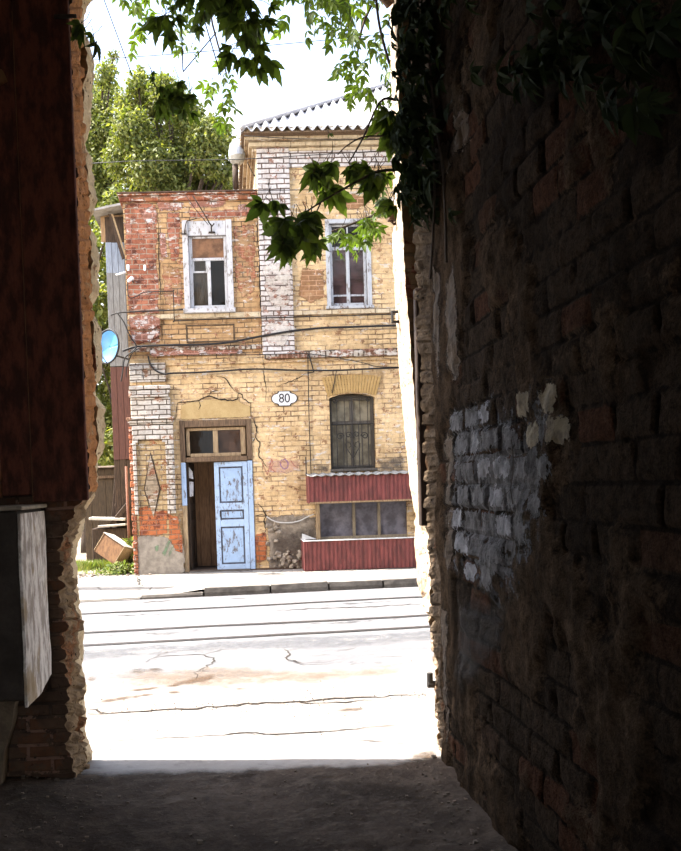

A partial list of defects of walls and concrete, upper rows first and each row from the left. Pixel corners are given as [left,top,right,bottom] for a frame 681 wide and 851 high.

peeling [346,194,366,209]
peeling [123,200,325,357]
crack [175,218,304,469]
peeling [448,378,572,610]
flaking render [138,506,185,575]
crack [146,654,216,671]
crack [101,725,391,741]
crack [87,693,427,714]